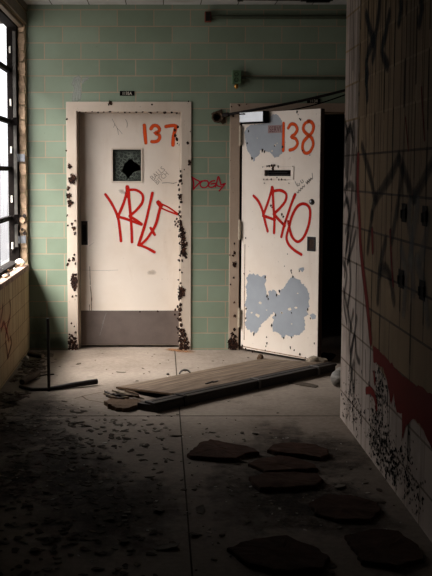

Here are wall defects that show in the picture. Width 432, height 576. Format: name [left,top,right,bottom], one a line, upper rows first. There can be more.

peeling [244,114,283,171]
corrosion [66,164,77,207]
corrosion [174,210,188,262]
corrosion [68,322,78,350]
corrosion [70,273,78,298]
corrosion [168,282,191,352]
peeling [245,267,316,339]
water stain [341,347,426,515]